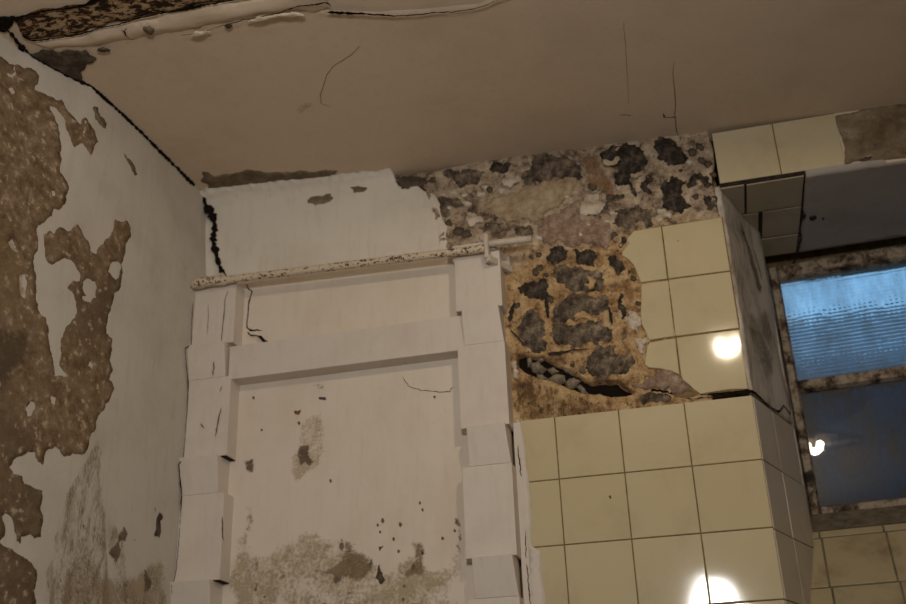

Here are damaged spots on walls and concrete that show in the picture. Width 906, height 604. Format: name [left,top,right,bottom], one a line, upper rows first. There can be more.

crack [0,16,268,590]
flaking render [0,0,337,604]
spalling [394,132,720,423]
damp [742,227,762,290]
crack [694,389,791,415]
damp [48,487,165,604]
damp [230,542,372,604]
damp [364,543,445,604]